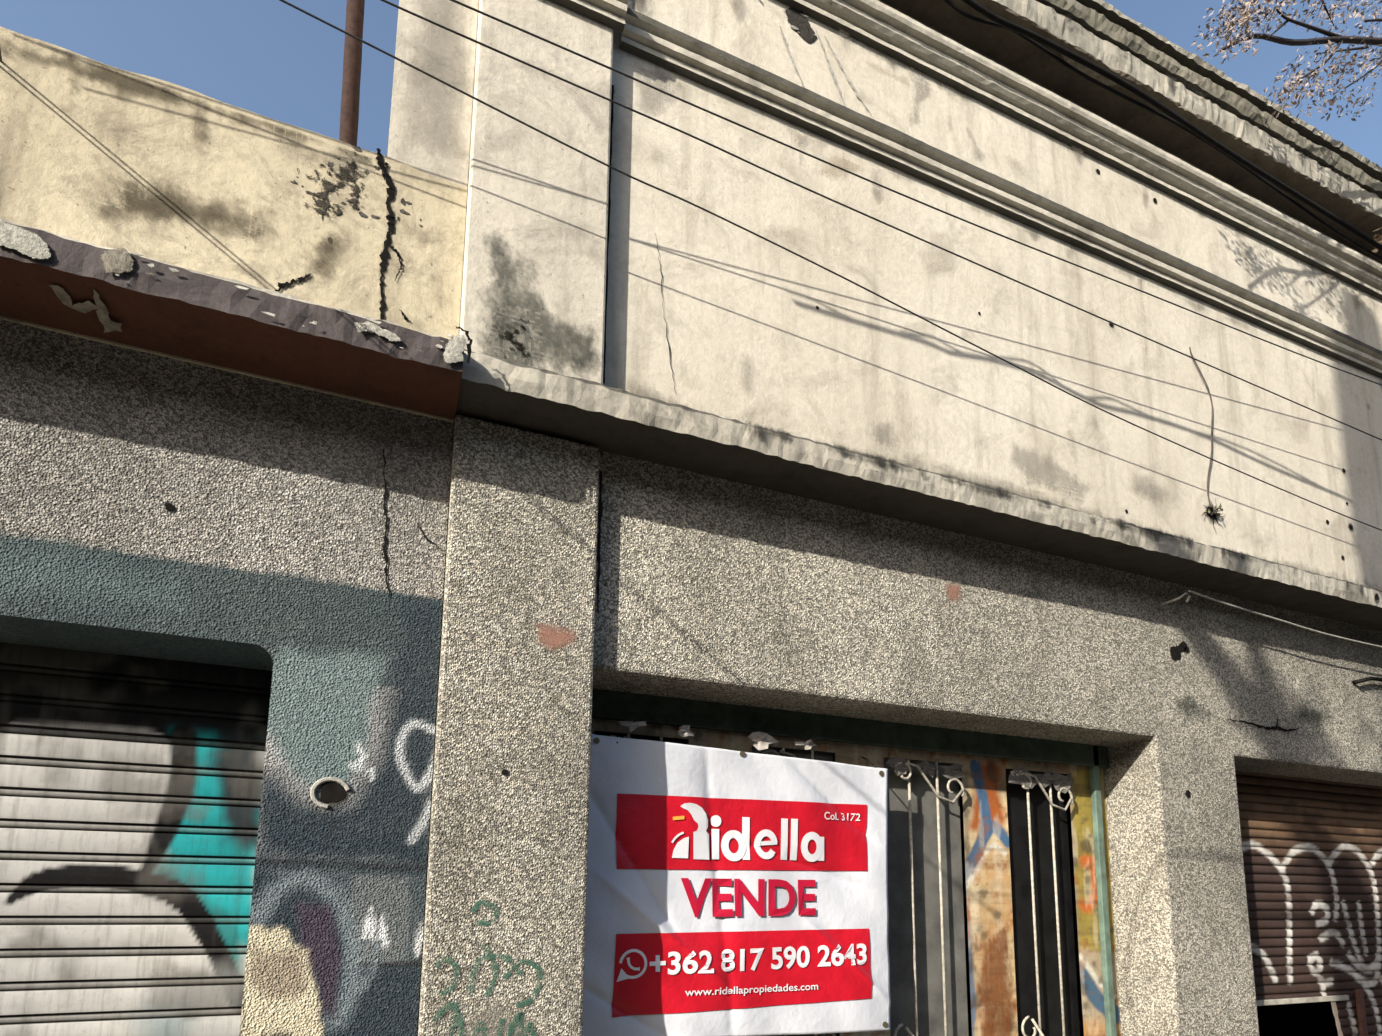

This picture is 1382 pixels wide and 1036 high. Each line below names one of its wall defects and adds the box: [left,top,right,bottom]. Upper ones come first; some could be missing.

peeling [0,219,51,259]
spalling [49,285,122,333]
peeling [99,248,180,276]
peeling [290,146,380,240]
crack [376,148,412,323]
peeling [354,319,467,363]
leakage [486,242,593,367]
crack [383,449,442,597]